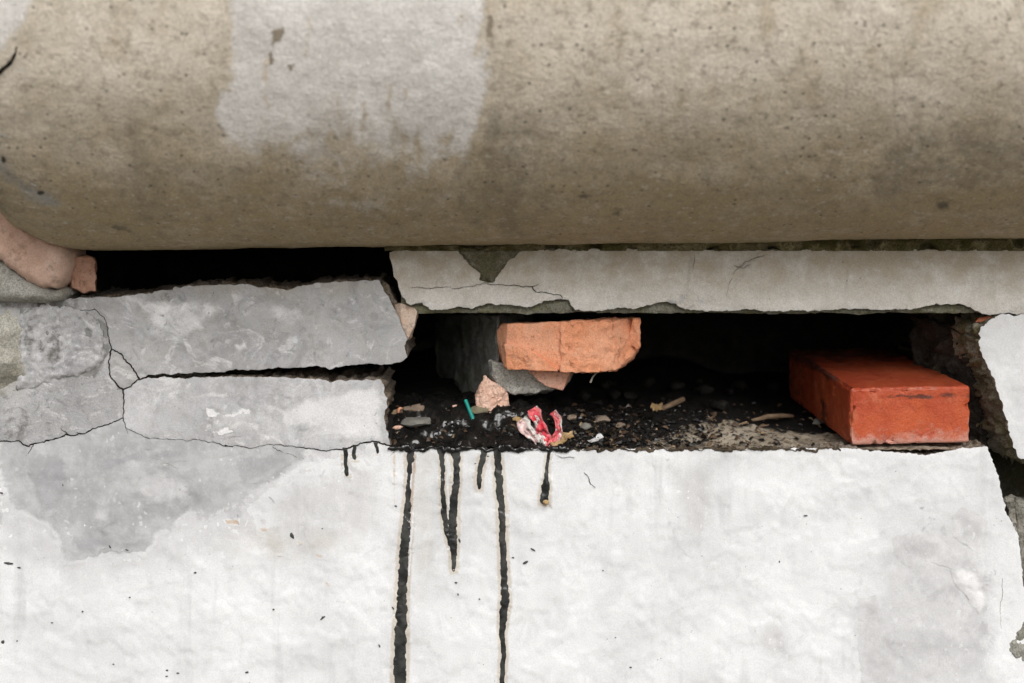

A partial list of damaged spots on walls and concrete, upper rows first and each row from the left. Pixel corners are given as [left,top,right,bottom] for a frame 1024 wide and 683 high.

crack [412,282,563,298]
crack [0,309,391,468]
spalling [1009,622,1024,661]